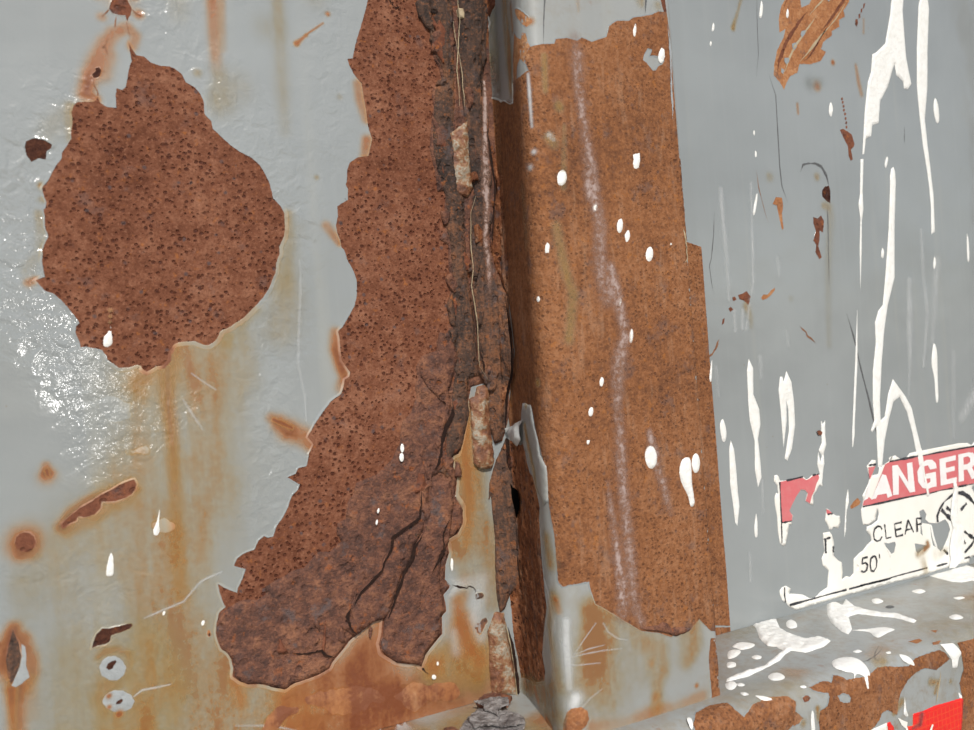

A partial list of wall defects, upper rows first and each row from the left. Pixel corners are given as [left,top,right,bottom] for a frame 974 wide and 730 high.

rust [213,0,496,730]
peeling [338,0,496,666]
rust [492,0,974,730]
crack [434,405,455,469]
rust [8,528,42,561]
rust [55,477,140,536]
crack [345,490,450,635]
rust [0,622,39,730]
rust [89,623,133,665]
rust [95,676,127,718]